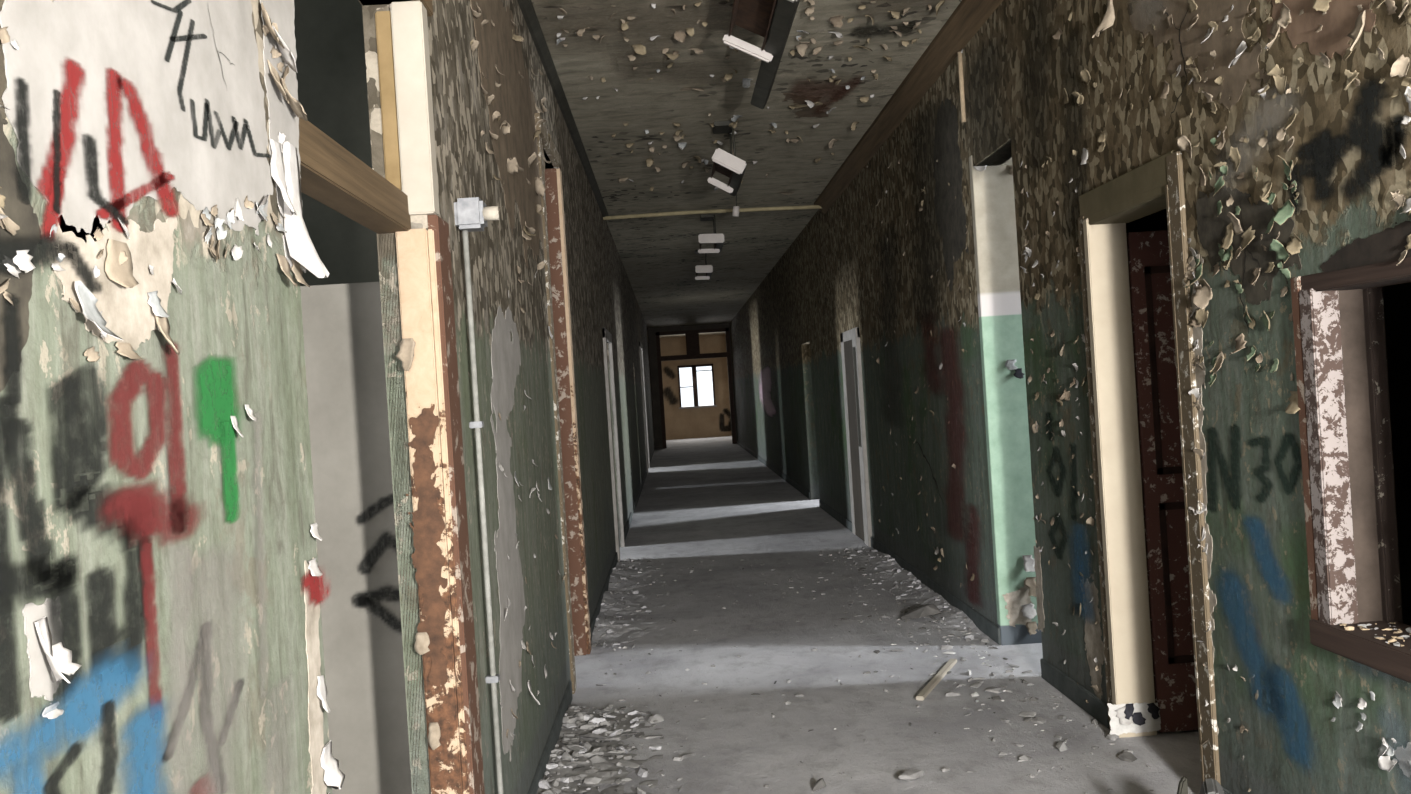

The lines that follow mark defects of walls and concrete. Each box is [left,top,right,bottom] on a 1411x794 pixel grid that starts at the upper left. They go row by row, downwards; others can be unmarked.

peeling [0,0,329,392]
peeling [556,1,708,81]
peeling [767,0,945,143]
peeling [906,98,987,292]
peeling [1063,60,1101,106]
peeling [1072,130,1106,165]
peeling [470,0,552,762]
peeling [1005,330,1088,451]
peeling [1092,0,1411,700]
peeling [1003,540,1161,735]
peeling [1331,691,1375,731]
peeling [1378,736,1411,777]